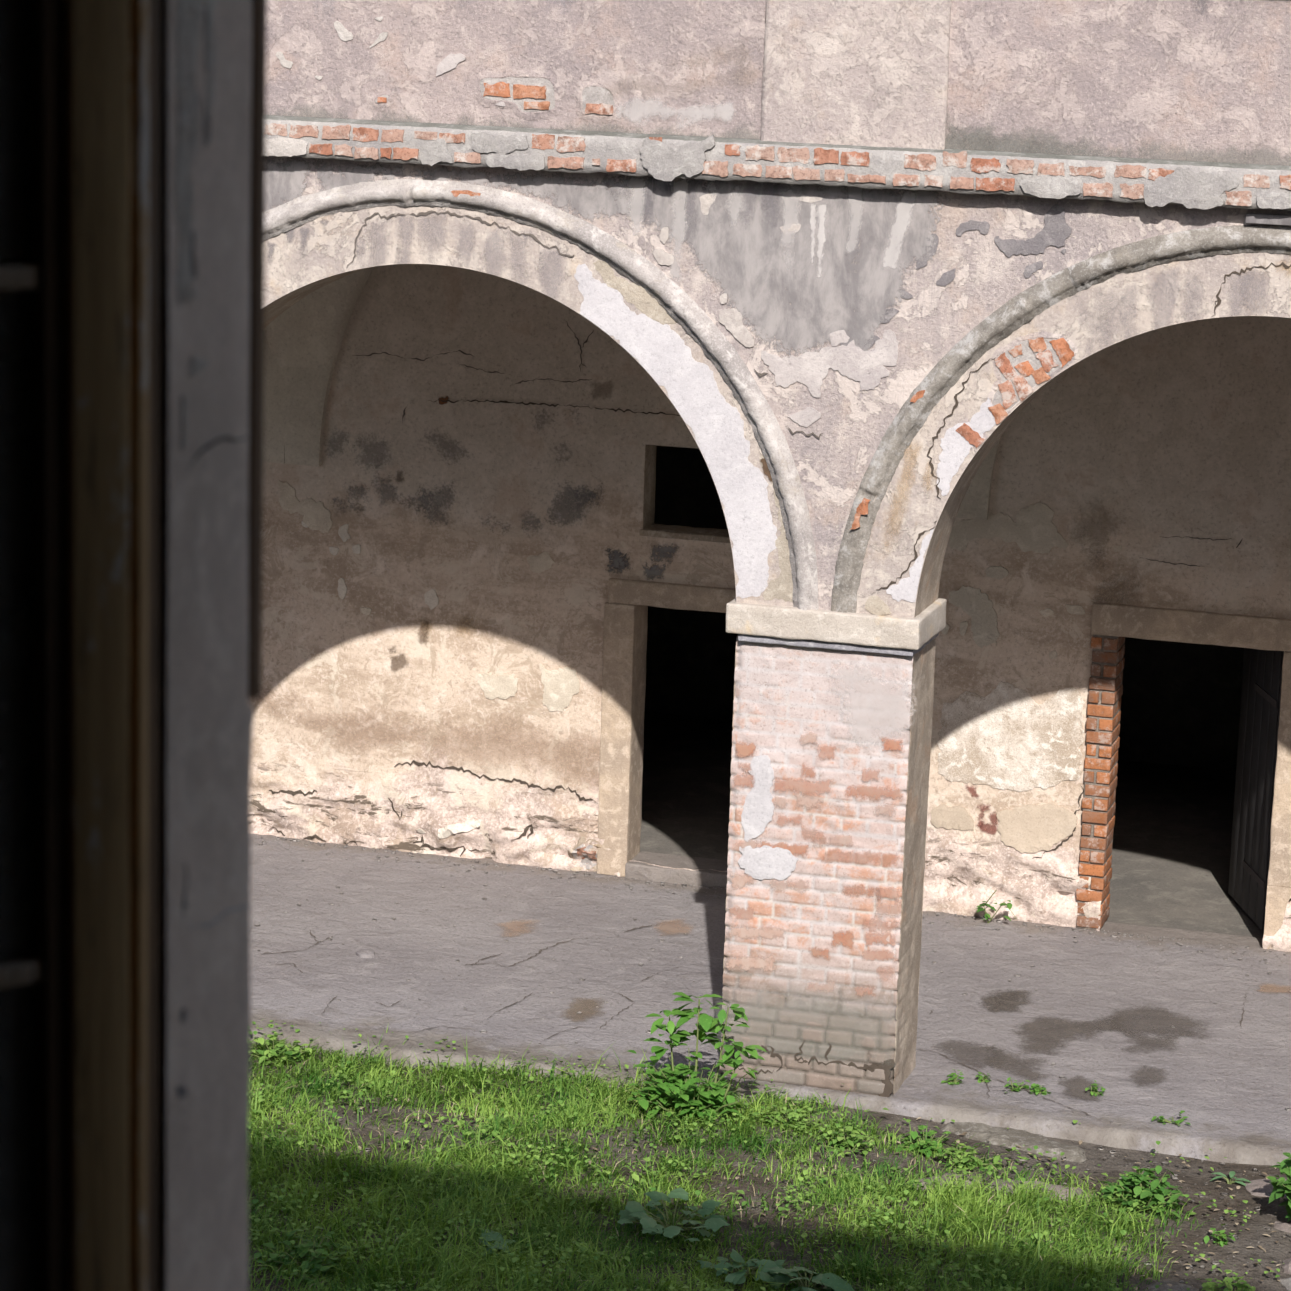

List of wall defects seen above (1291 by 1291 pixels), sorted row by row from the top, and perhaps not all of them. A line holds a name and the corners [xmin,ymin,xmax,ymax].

spalling [266,68,1291,278]
crack [1211,262,1291,317]
flaking render [719,289,913,427]
peeling [574,260,793,602]
spalling [936,331,1078,496]
peeling [865,529,934,615]
crack [269,790,358,846]
crack [388,798,479,857]
crack [394,760,593,801]
crack [513,824,534,840]
damp [938,990,1206,1080]
damp [1060,1076,1097,1101]